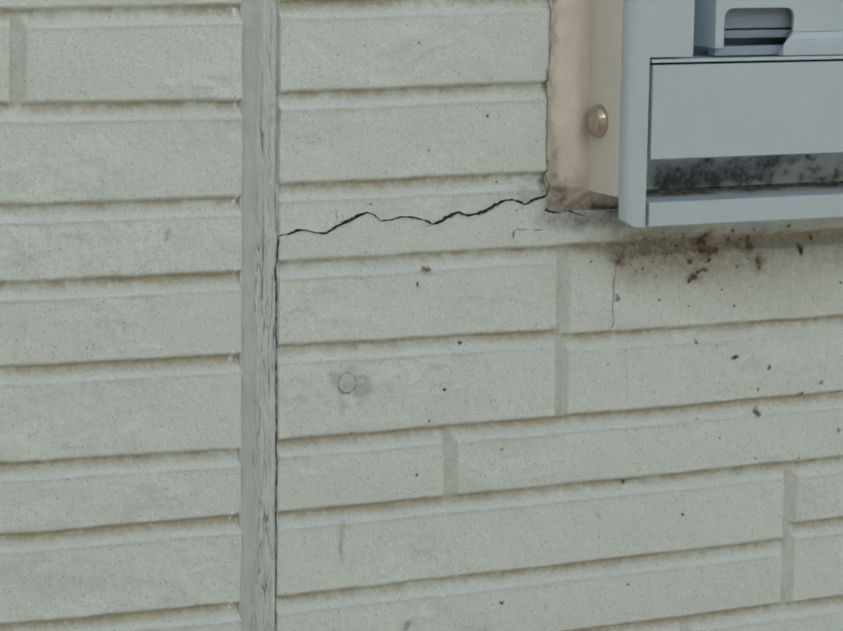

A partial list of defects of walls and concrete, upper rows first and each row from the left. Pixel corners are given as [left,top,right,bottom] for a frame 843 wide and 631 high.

crack [252,1,582,630]